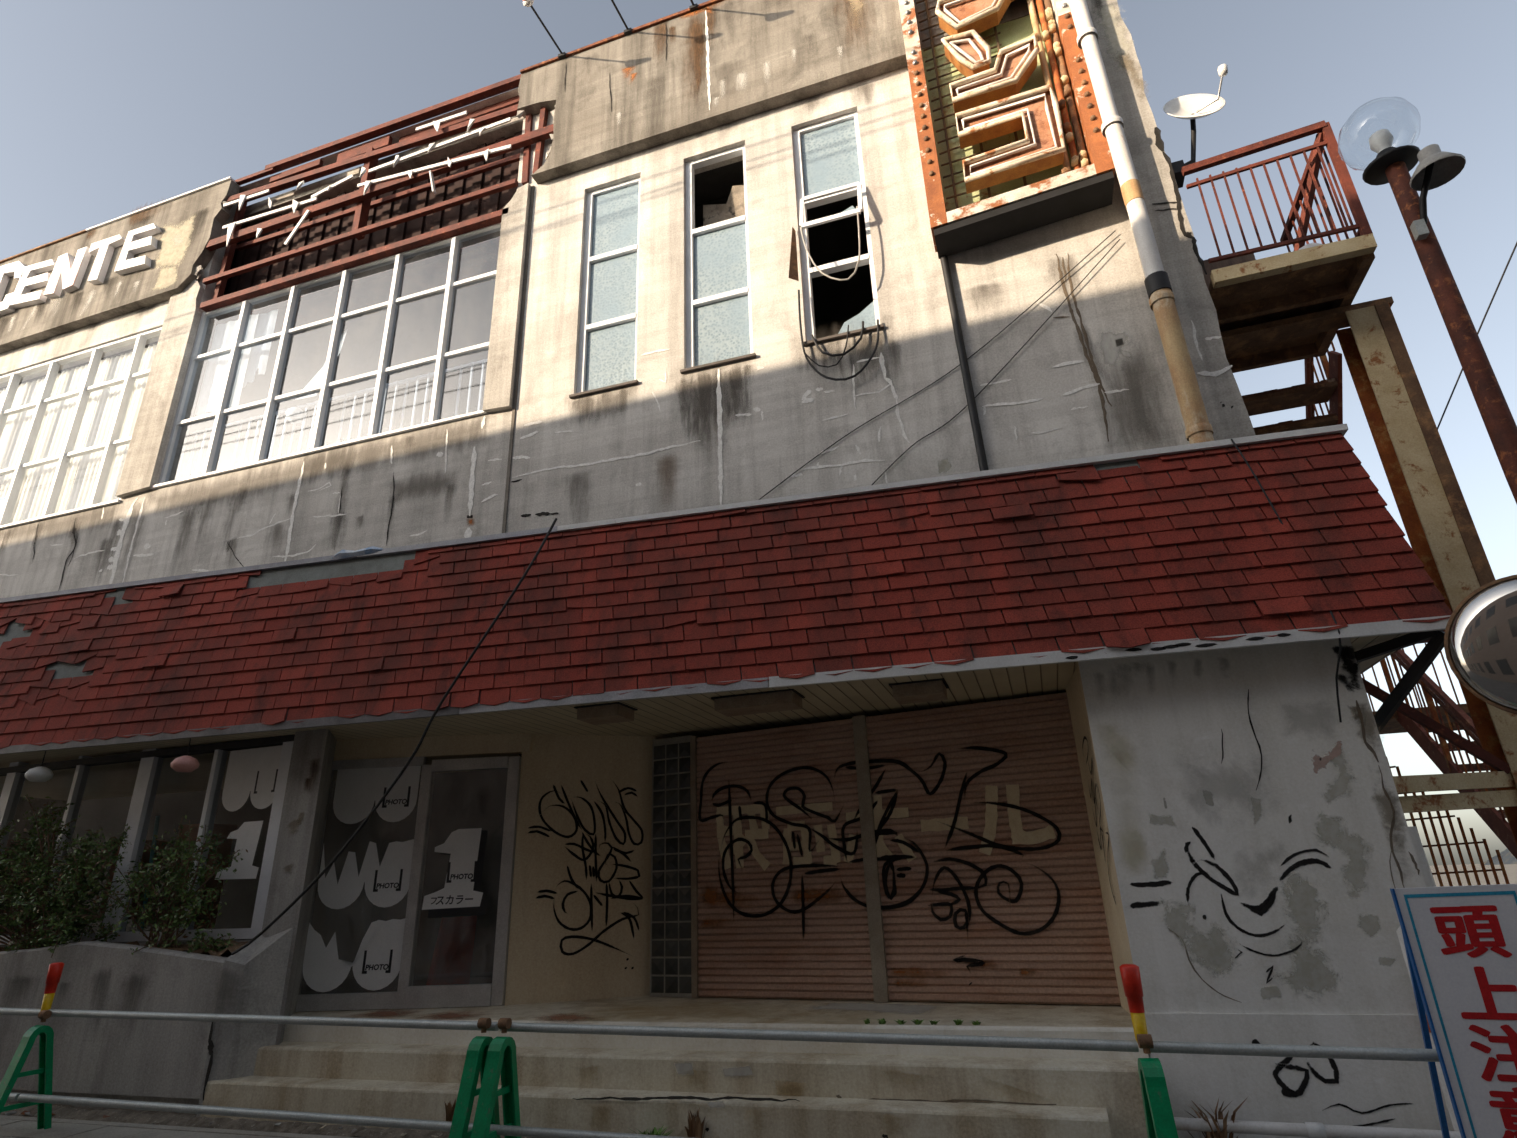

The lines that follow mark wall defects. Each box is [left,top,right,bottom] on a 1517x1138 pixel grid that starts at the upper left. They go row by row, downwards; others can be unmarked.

damp [682,366,748,417]
damp [158,425,478,526]
corrosion [1374,302,1495,587]
damp [1333,646,1375,737]
crack [203,1022,214,1101]